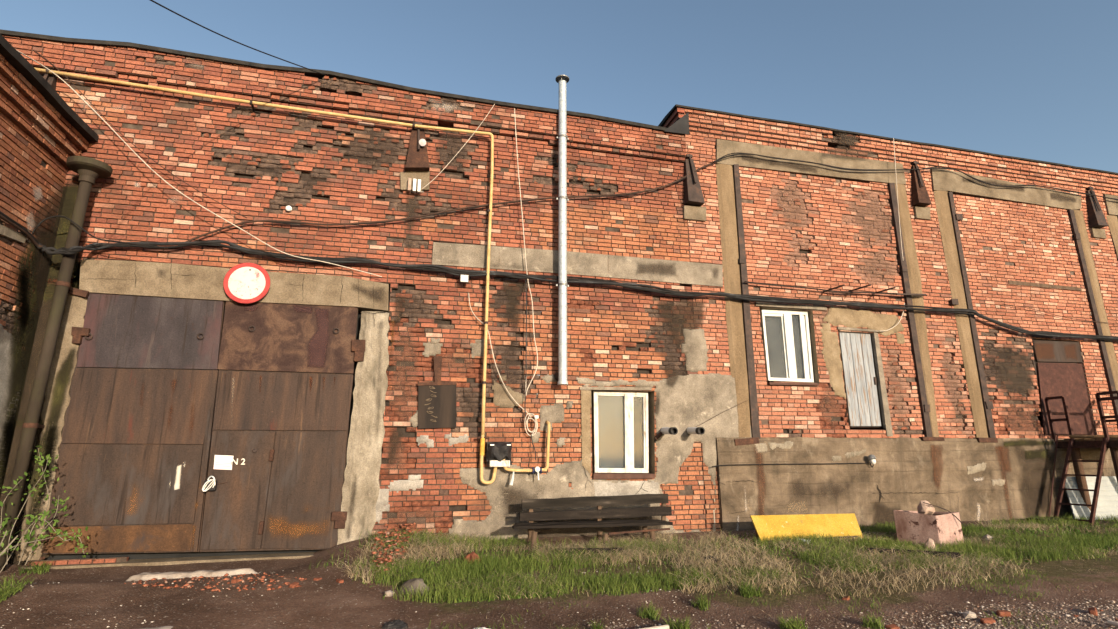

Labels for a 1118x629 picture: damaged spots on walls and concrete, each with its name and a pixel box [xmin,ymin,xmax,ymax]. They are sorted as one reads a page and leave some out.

spalling [303,76,377,97]
spalling [202,107,463,220]
leakage [0,178,80,566]
peeling [375,277,802,540]
peeling [802,301,923,438]
leakage [790,483,848,511]
leakage [875,504,895,525]
leakage [1018,451,1054,518]